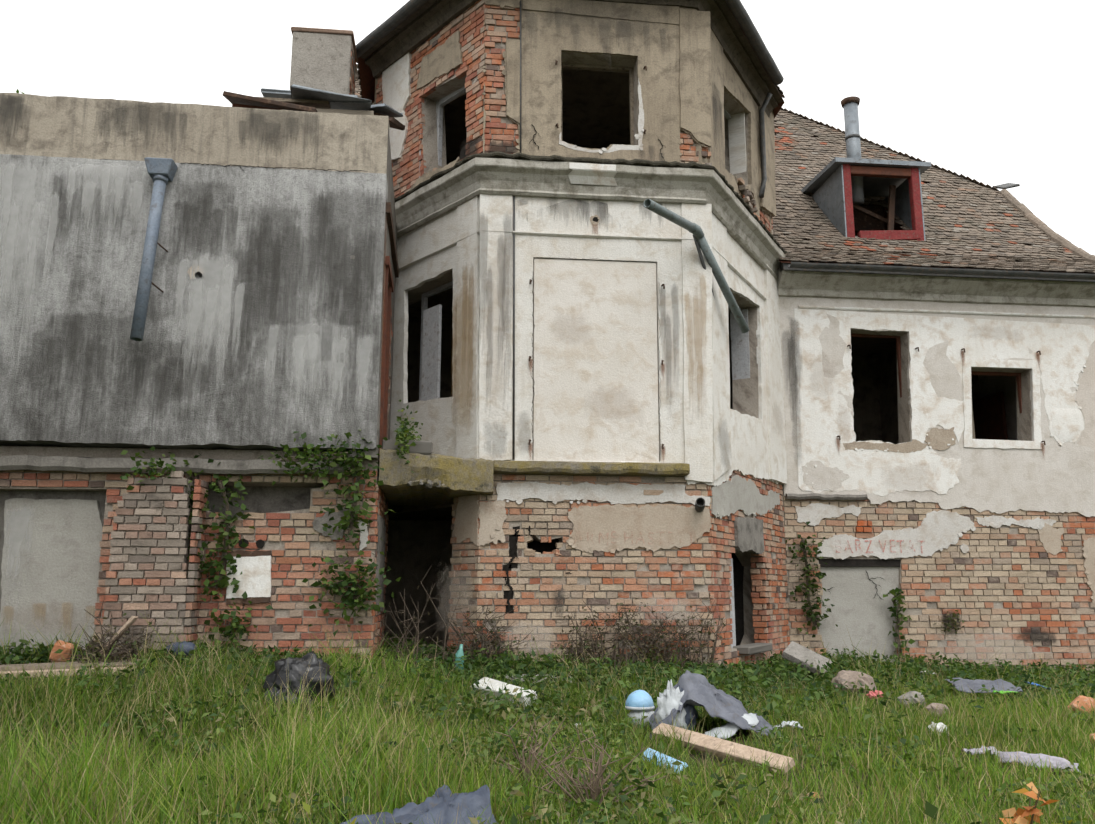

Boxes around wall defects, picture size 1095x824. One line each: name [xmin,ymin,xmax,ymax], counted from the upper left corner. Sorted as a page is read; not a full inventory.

flaking render [382,52,412,160]
spalling [482,3,524,154]
flaking render [409,157,460,191]
spalling [679,133,712,166]
spalling [735,176,774,236]
peeling [1050,339,1095,461]
spalling [924,427,956,450]
spalling [802,461,849,491]
spalling [856,521,872,532]
crack [505,526,531,613]
spalling [493,526,593,613]